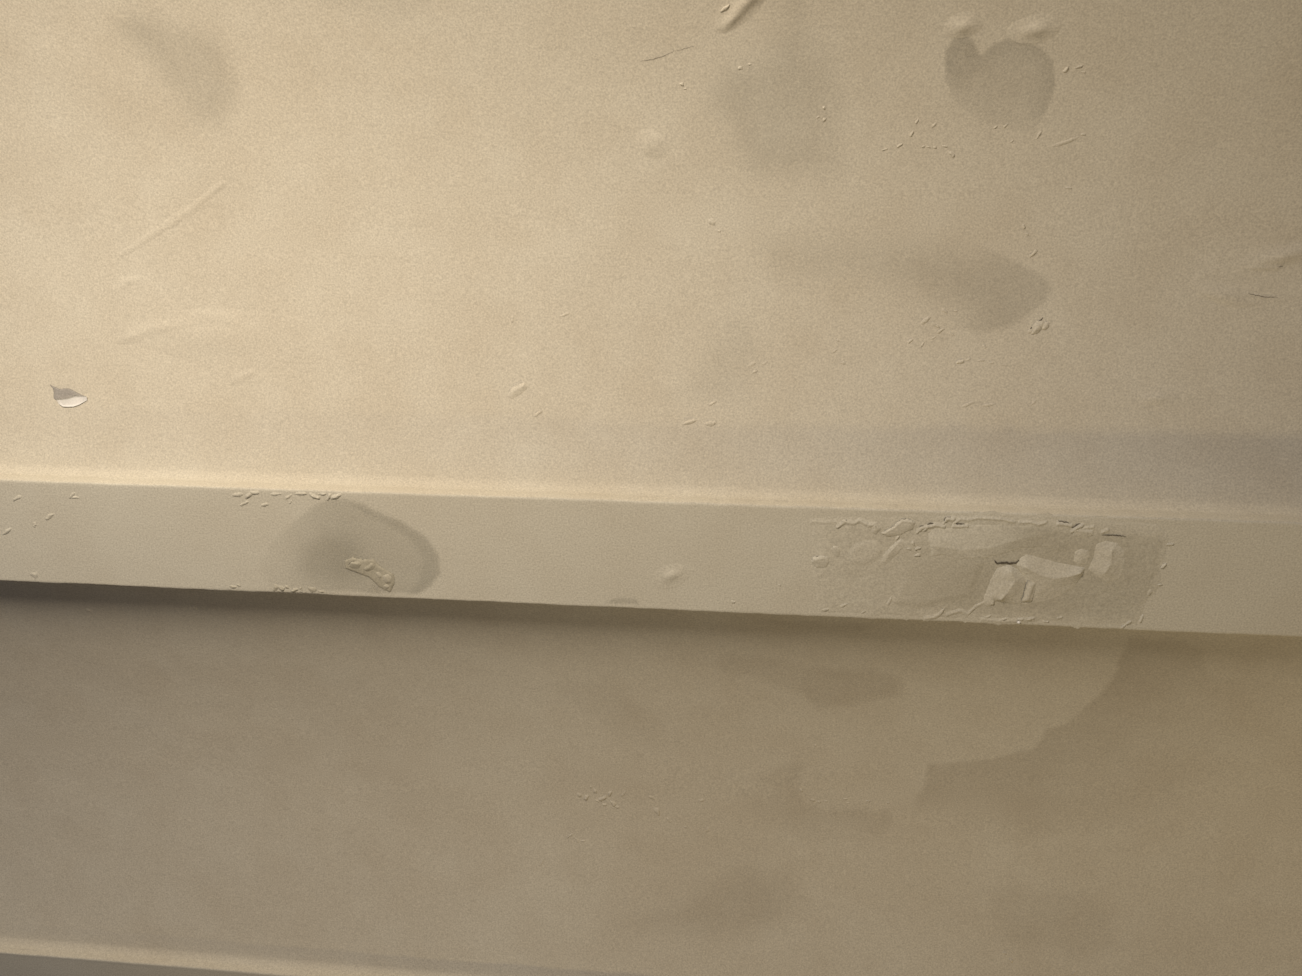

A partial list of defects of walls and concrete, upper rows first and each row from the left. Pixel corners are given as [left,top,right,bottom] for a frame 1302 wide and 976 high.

peeling [51,385,87,407]
flaking render [809,511,1174,629]